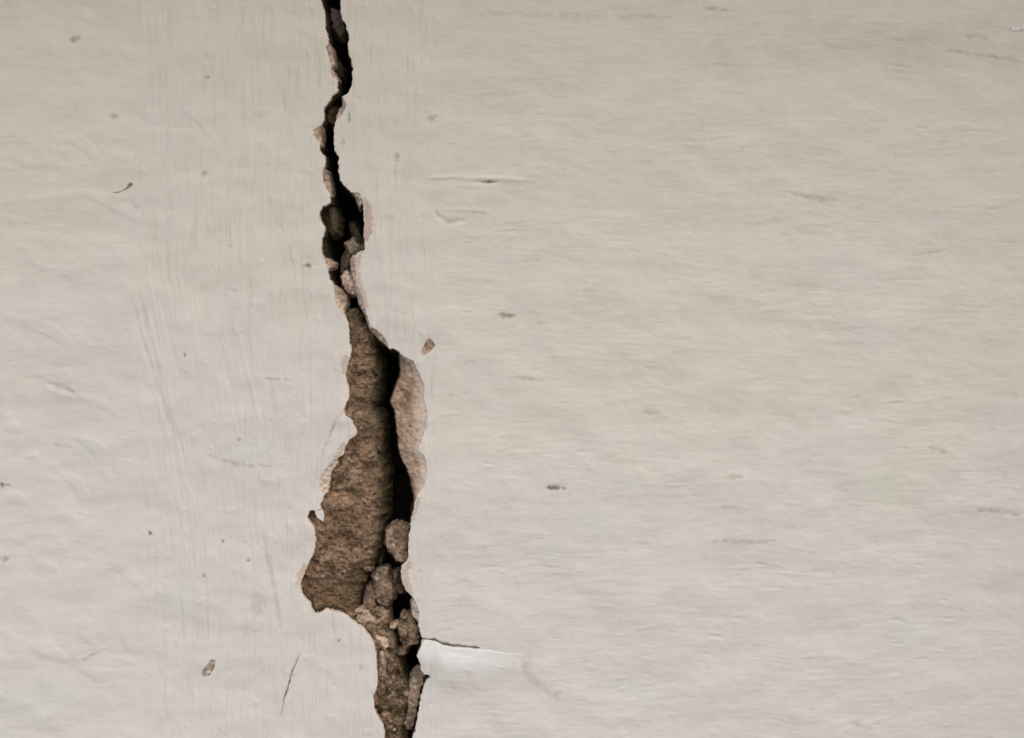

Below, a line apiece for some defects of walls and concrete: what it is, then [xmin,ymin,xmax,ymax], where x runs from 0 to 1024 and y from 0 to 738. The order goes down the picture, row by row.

crack [297,0,480,738]
peeling [422,338,435,355]